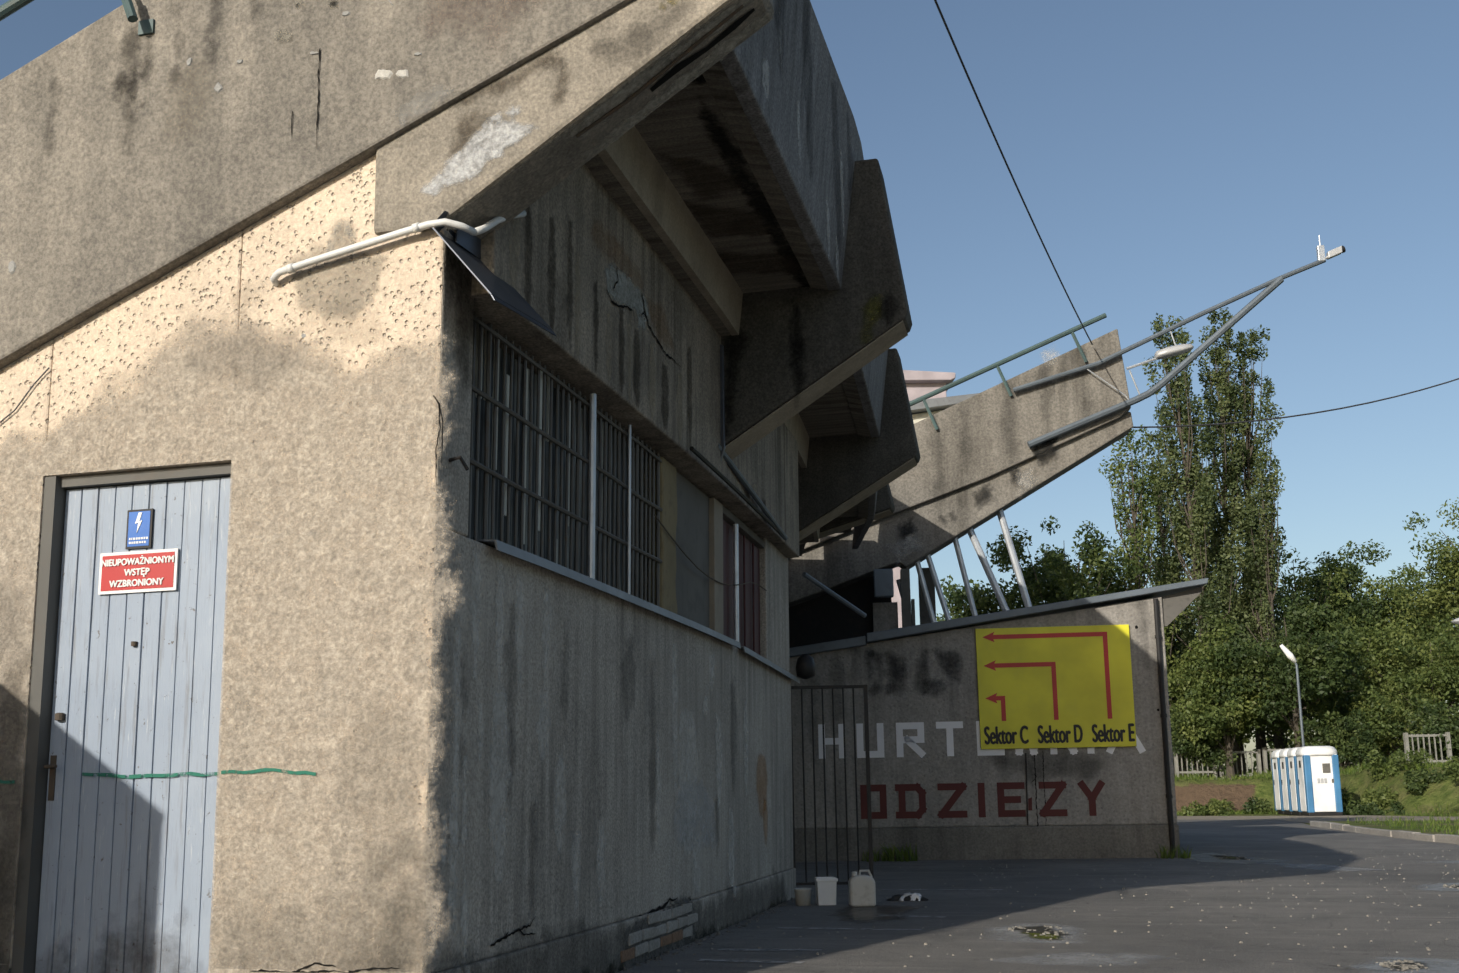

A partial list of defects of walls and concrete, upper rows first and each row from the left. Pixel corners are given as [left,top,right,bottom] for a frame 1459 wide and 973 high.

spalling [423,0,772,215]
leakage [0,321,479,973]
spalling [620,898,698,968]